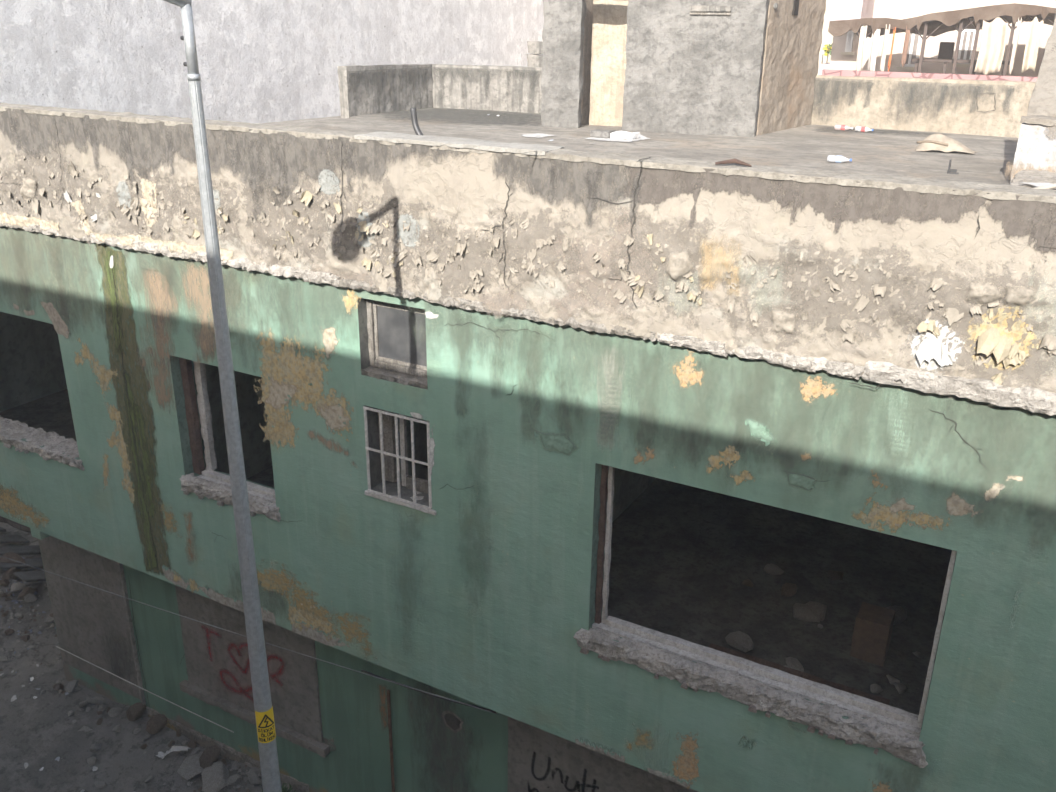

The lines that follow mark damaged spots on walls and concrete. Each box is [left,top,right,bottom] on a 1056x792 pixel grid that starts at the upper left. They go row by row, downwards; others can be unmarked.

spalling [0,415,85,471]
peeling [13,302,135,504]
peeling [0,148,206,254]
water stain [105,249,124,355]
peeling [254,327,354,450]
peeling [212,169,728,388]
crack [484,182,513,289]
crack [591,157,651,306]
peeling [718,240,1056,416]
flaking render [853,470,1023,533]
peeling [257,564,349,647]
spalling [574,627,928,768]